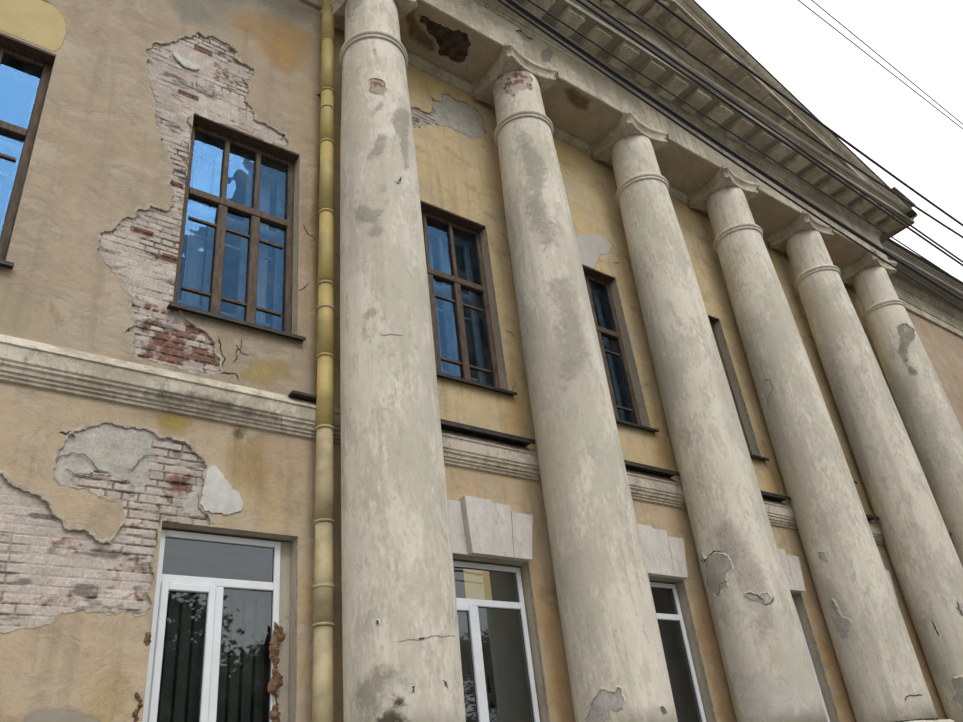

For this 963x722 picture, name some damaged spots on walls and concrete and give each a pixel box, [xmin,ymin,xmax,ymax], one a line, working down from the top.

flaking render [367,77,388,111]
flaking render [493,70,533,96]
flaking render [393,92,488,168]
flaking render [95,32,289,377]
crack [218,339,248,380]
peeling [898,323,916,375]
flaking render [0,419,215,634]
flaking render [700,551,734,599]
spalling [132,692,143,722]
spalling [267,622,286,722]
water stain [359,669,404,722]
flaking render [584,685,627,722]